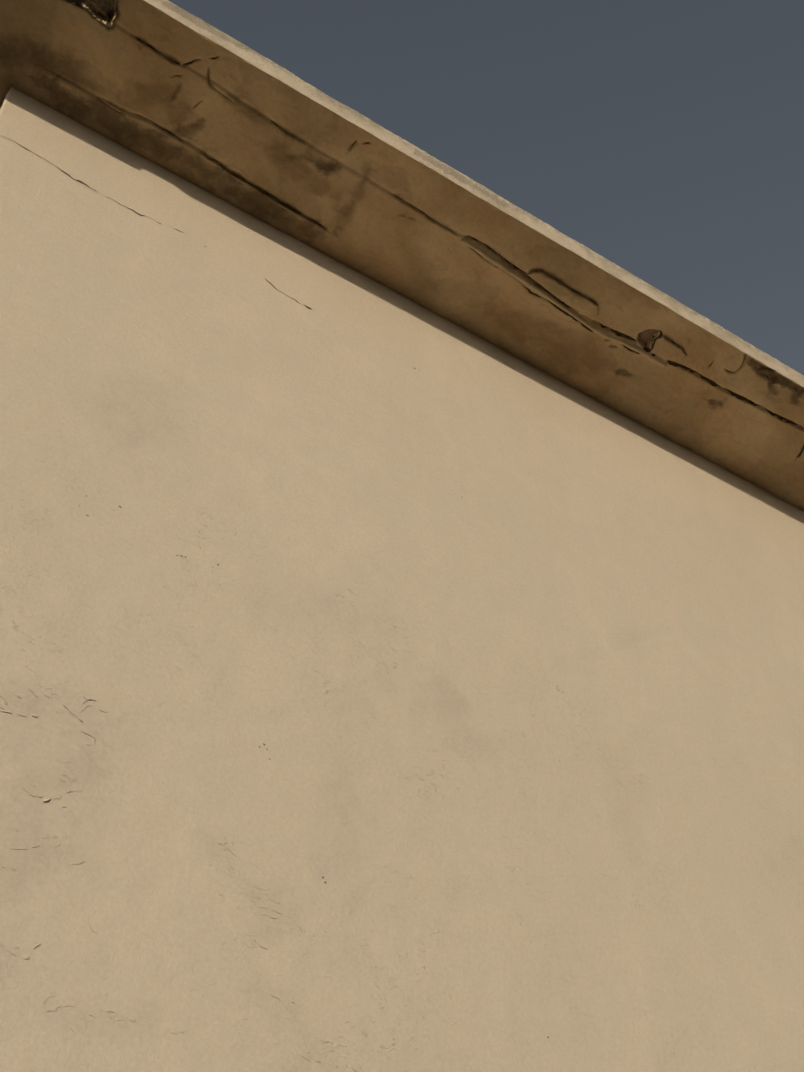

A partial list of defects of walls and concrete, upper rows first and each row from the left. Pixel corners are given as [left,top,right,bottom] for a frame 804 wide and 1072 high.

spalling [64,0,118,30]
crack [0,135,184,233]
crack [264,279,311,309]
crack [393,194,804,458]
spalling [637,329,687,362]
leakage [749,359,804,392]